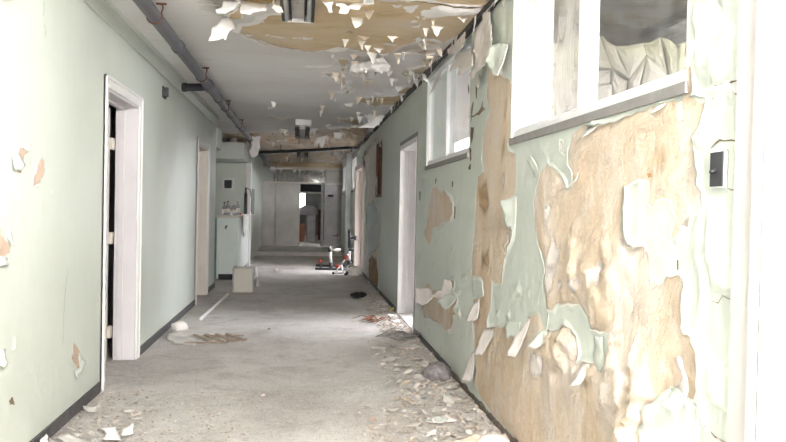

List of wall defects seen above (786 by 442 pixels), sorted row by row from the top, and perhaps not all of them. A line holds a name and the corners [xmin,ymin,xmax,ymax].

peeling [11,143,45,189]
peeling [209,0,489,292]
peeling [0,225,15,266]
peeling [415,61,713,442]
peeling [70,340,86,379]